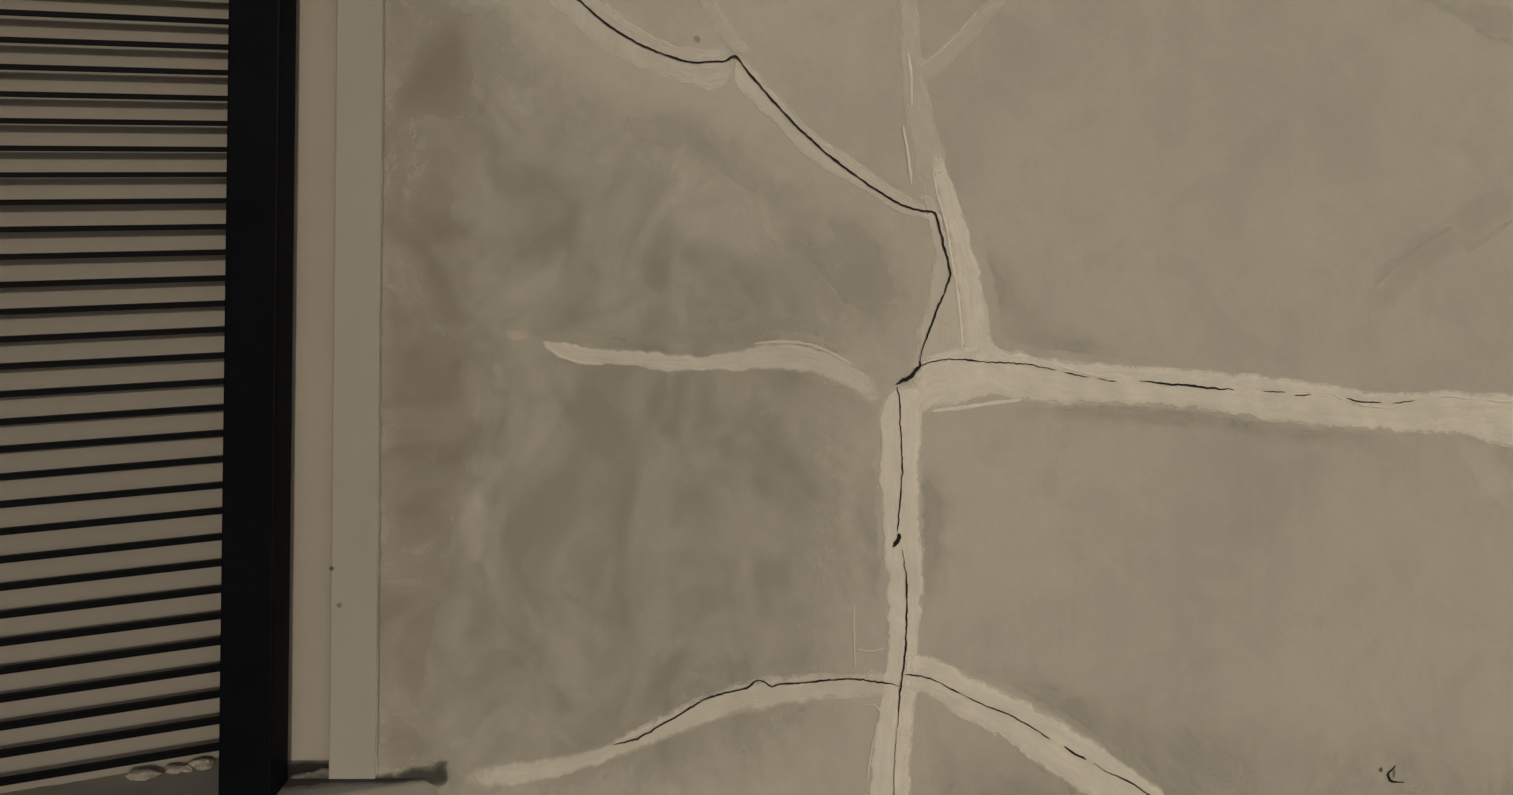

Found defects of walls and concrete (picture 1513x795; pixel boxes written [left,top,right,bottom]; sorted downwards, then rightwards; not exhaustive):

crack [578,0,1414,795]